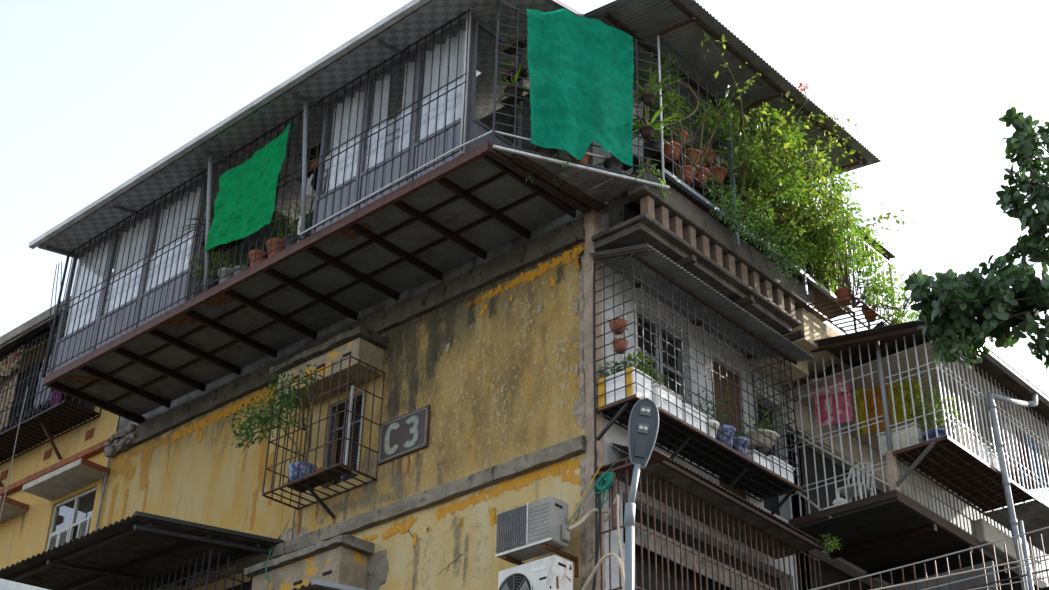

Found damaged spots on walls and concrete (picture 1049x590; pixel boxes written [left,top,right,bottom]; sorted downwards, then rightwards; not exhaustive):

water stain [385,247,575,419]
peeling [465,244,586,428]
peeling [362,456,593,589]